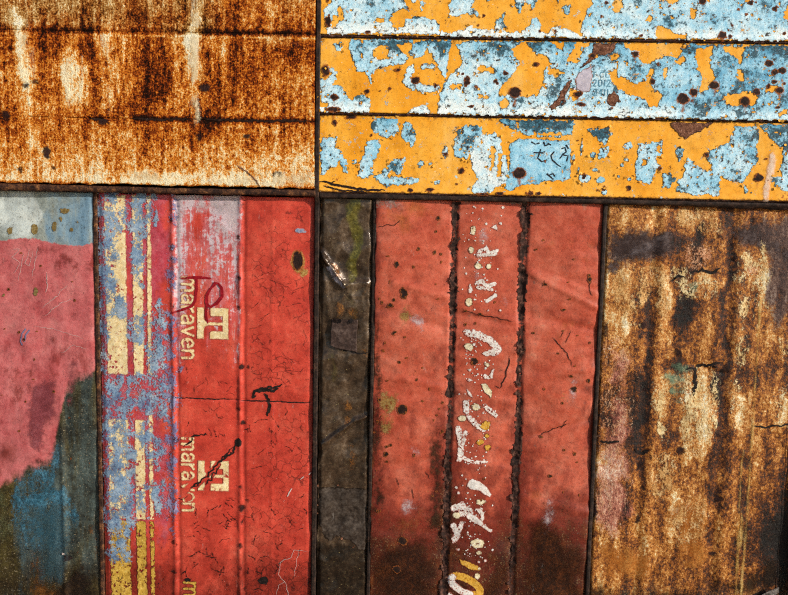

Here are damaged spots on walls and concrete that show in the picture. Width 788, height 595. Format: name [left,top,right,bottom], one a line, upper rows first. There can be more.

peeling [319,0,788,196]
peeling [97,192,207,563]
spalling [191,446,236,488]
crack [156,365,310,452]
crack [249,271,305,382]
leakage [430,442,441,528]
leakage [523,520,583,595]
rust [595,207,722,512]
rust [673,498,709,547]
crack [686,362,722,396]
rust [734,226,788,367]
crack [754,422,788,430]